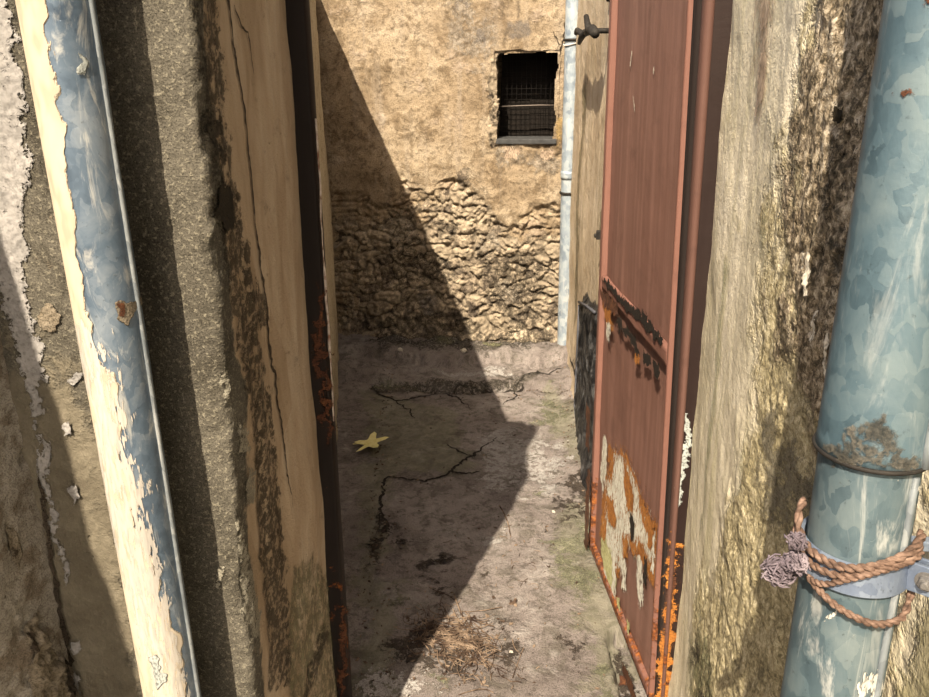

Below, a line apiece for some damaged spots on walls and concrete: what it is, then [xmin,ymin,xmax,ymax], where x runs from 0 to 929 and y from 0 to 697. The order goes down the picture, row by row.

peeling [76,53,89,75]
leakage [801,119,857,296]
peeling [0,0,70,588]
peeling [67,372,83,386]
crack [371,344,575,417]
corrosion [600,277,664,346]
leakage [809,310,830,376]
peeling [67,485,80,505]
crack [376,437,498,534]
corrosion [584,438,684,697]